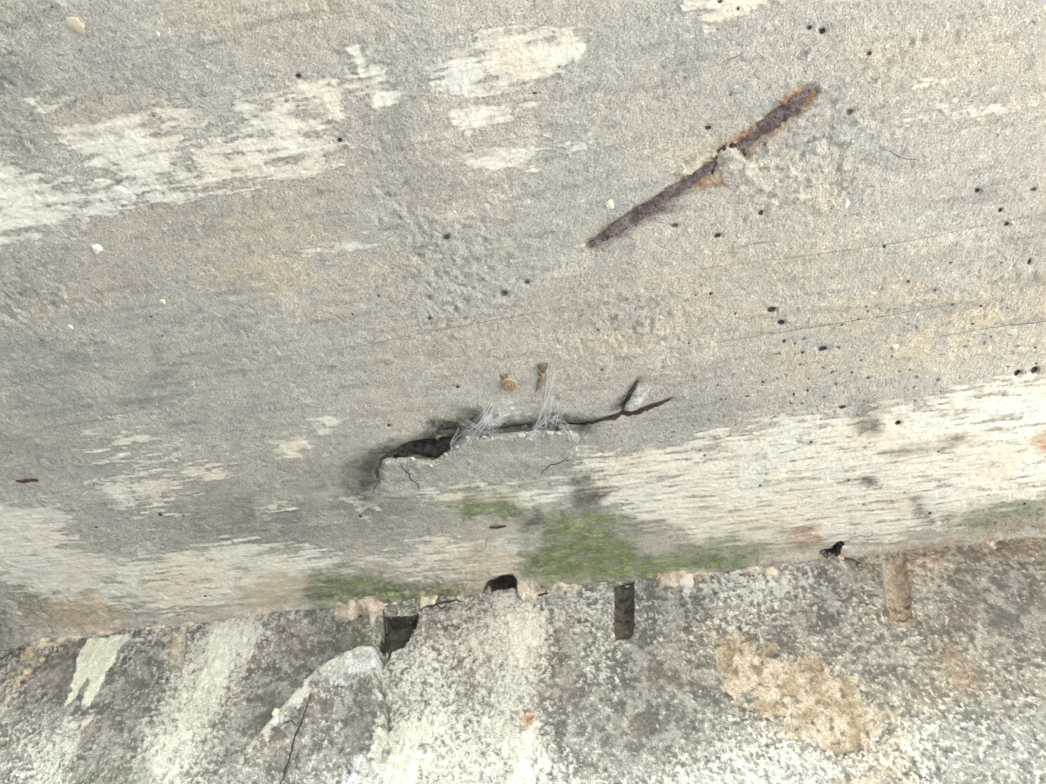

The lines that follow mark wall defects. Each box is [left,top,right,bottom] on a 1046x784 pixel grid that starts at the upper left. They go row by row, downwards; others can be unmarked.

crack [373,380,671,499]
crack [277,695,310,784]